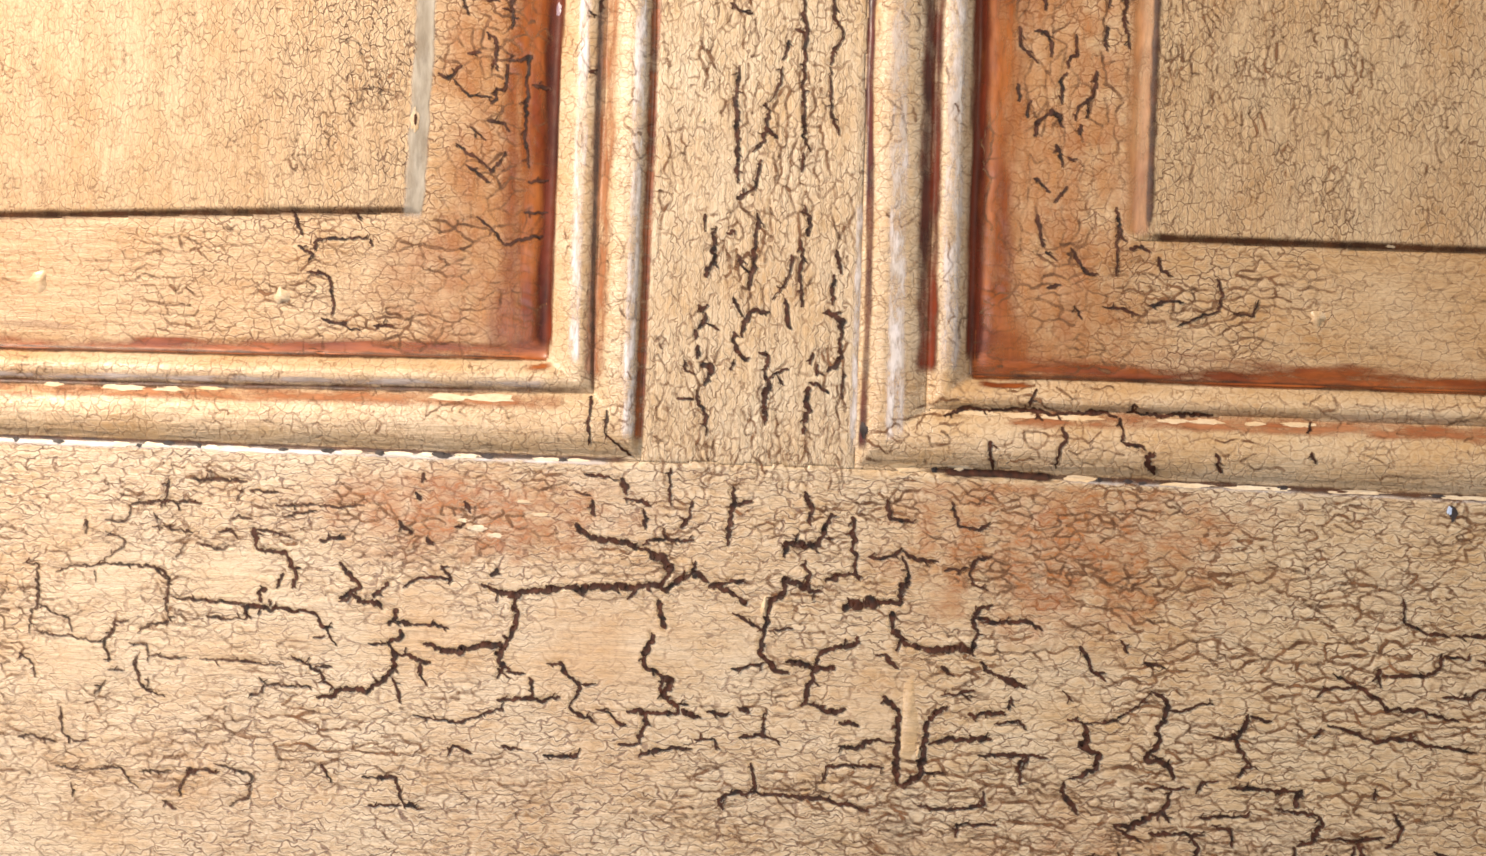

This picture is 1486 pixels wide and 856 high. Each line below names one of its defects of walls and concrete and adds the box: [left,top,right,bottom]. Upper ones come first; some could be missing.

crack [292,210,393,331]
crack [345,38,392,105]
crack [438,0,551,246]
crack [677,0,846,436]
crack [1016,0,1259,327]
crack [18,388,1404,856]
crack [1314,599,1486,754]